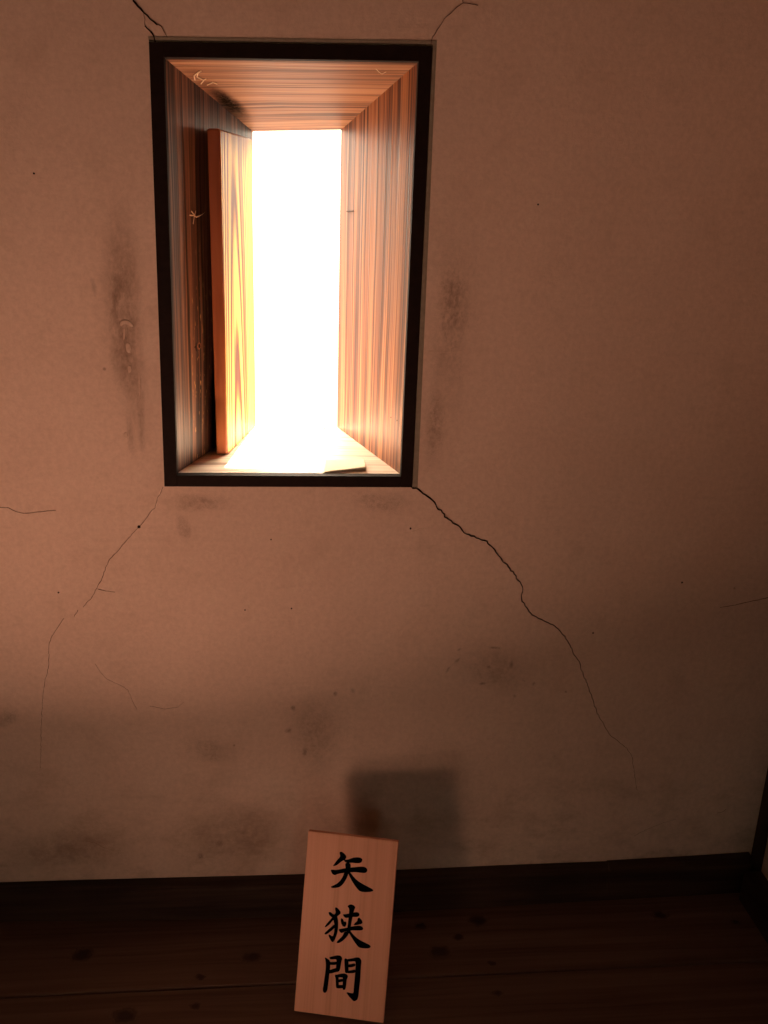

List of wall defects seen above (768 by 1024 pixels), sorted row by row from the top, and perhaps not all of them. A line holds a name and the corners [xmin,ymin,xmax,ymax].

crack [133,0,167,42]
crack [40,488,163,762]
crack [411,487,637,789]